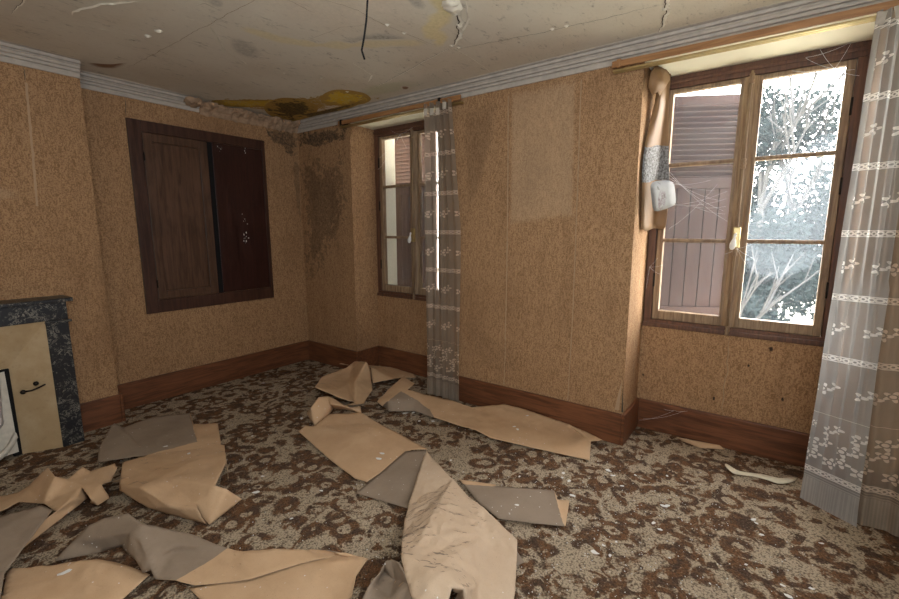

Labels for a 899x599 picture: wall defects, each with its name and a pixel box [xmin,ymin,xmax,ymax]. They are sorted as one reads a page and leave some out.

leakage [206,0,456,61]
crack [291,0,670,87]
leakage [202,79,428,121]
peeling [641,66,676,231]
leakage [259,123,352,293]